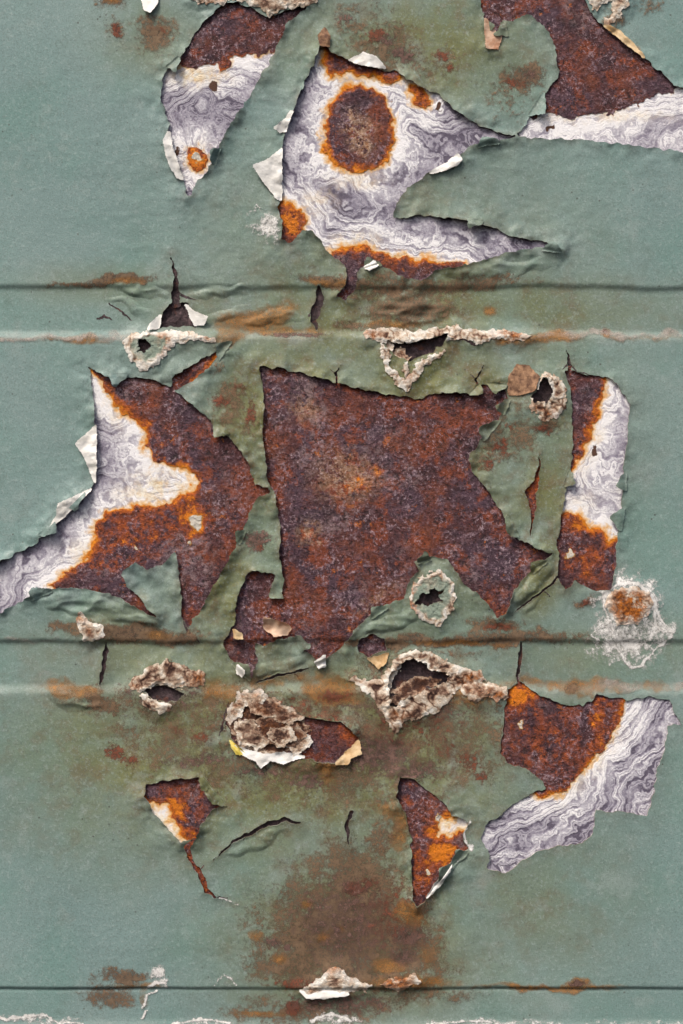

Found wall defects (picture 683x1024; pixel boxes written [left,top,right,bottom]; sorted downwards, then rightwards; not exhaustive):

peeling [160,2,307,196]
peeling [253,0,683,300]
peeling [0,340,630,768]
water stain [586,568,676,669]
peeling [144,775,227,843]
crack [184,817,301,899]
corrosion [48,617,589,1024]
crack [344,810,354,847]
peeling [396,777,469,906]
peeling [481,676,681,873]
corrosion [507,978,610,994]